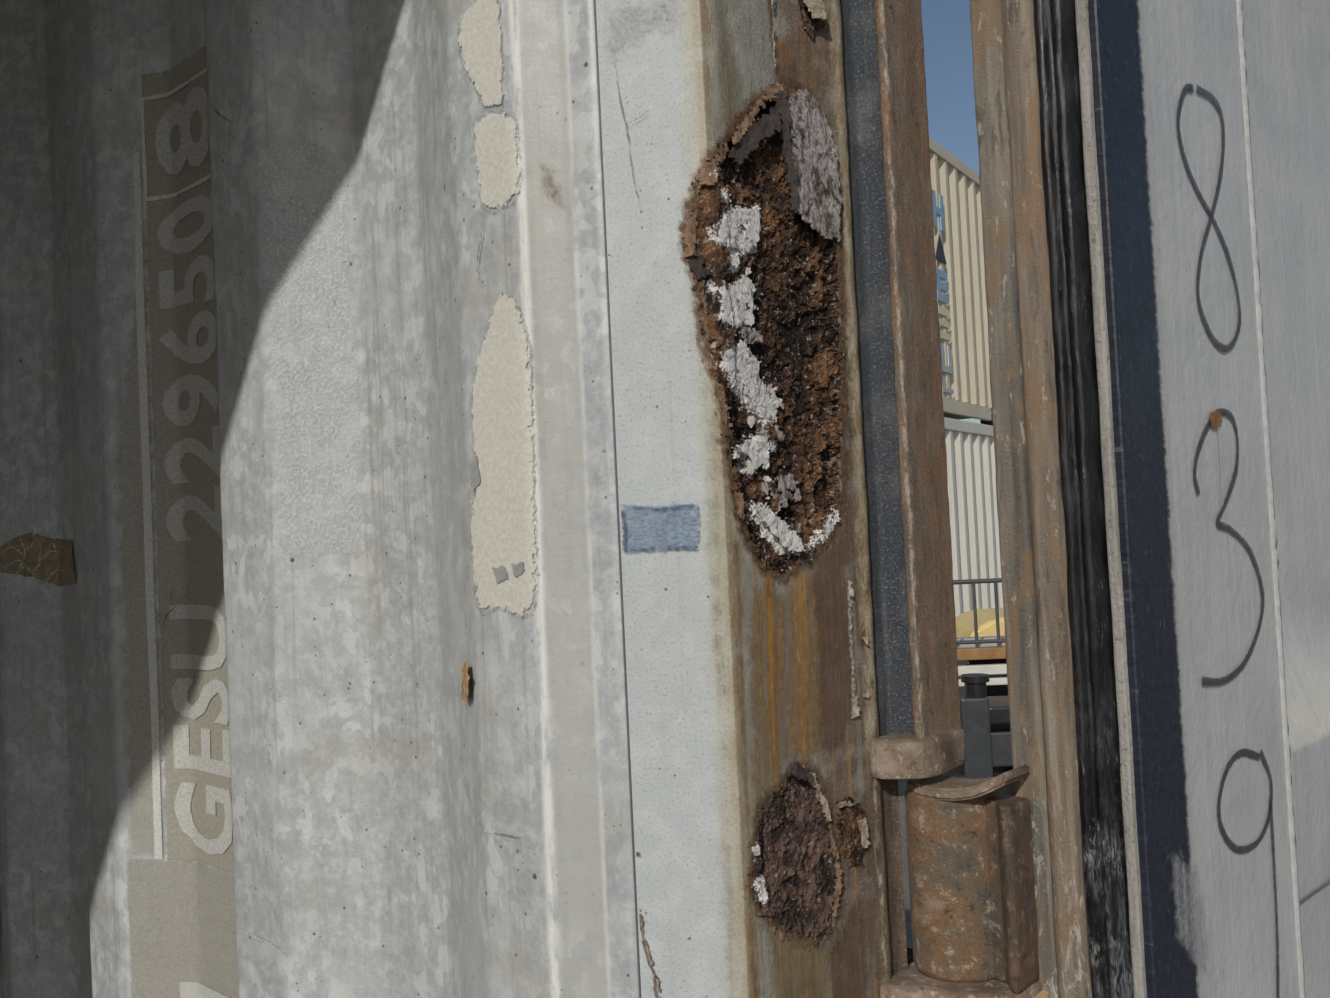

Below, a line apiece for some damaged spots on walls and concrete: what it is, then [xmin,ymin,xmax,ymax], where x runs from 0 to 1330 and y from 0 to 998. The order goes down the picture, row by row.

peeling [457,0,521,212]
rust [798,0,828,41]
peeling [469,290,539,618]
rust [678,39,870,998]
crack [639,909,661,998]